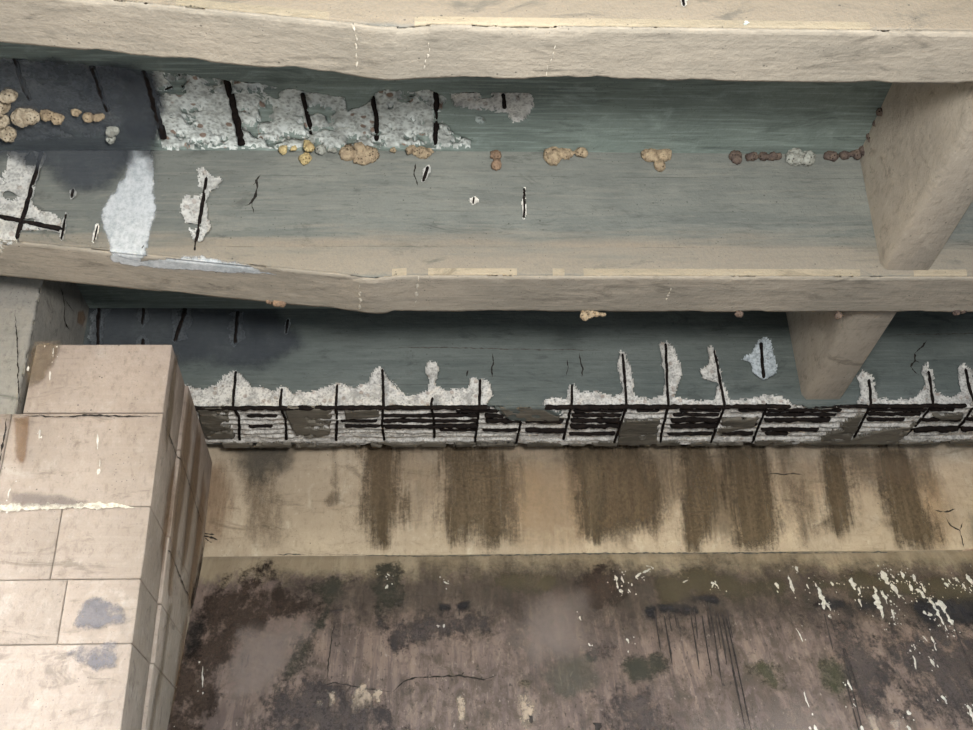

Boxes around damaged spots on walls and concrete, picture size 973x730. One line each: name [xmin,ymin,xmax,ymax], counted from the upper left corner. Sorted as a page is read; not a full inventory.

water stain [0,59,163,190]
spalling [141,70,534,151]
spalling [0,154,67,253]
spalling [180,167,223,251]
spalling [173,308,187,341]
spalling [185,337,973,448]
water stain [358,444,410,549]
water stain [438,444,525,547]
water stain [563,444,661,544]
water stain [681,444,783,552]
water stain [821,444,943,550]
water stain [168,544,973,730]